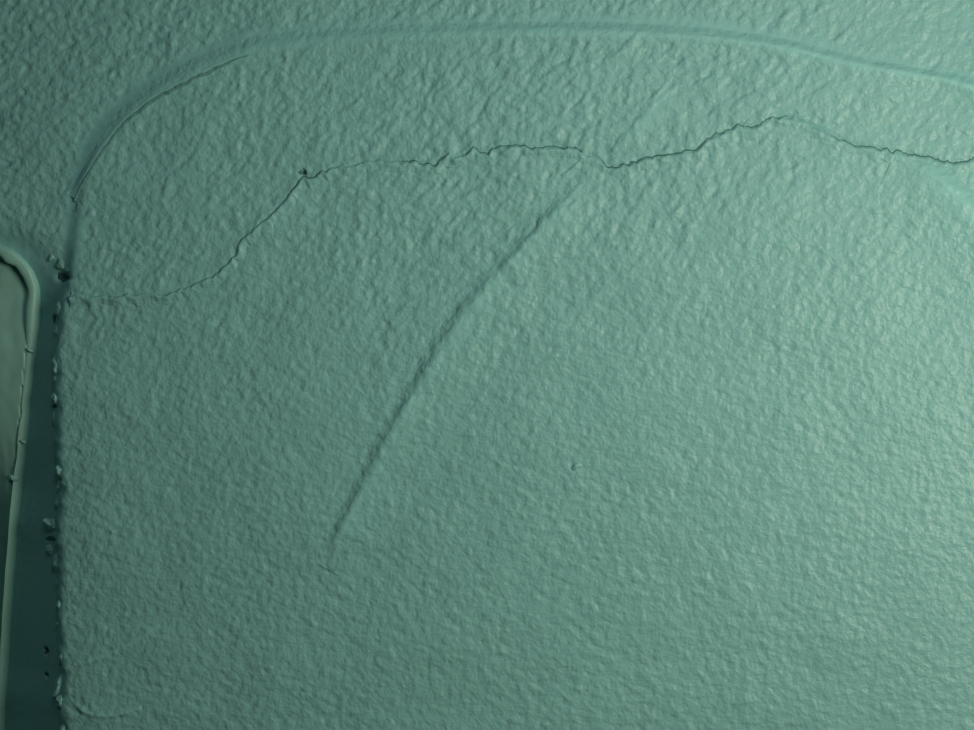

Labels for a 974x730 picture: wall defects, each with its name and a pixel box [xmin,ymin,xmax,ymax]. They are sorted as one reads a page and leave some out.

crack [69,52,249,202]
crack [68,110,974,308]